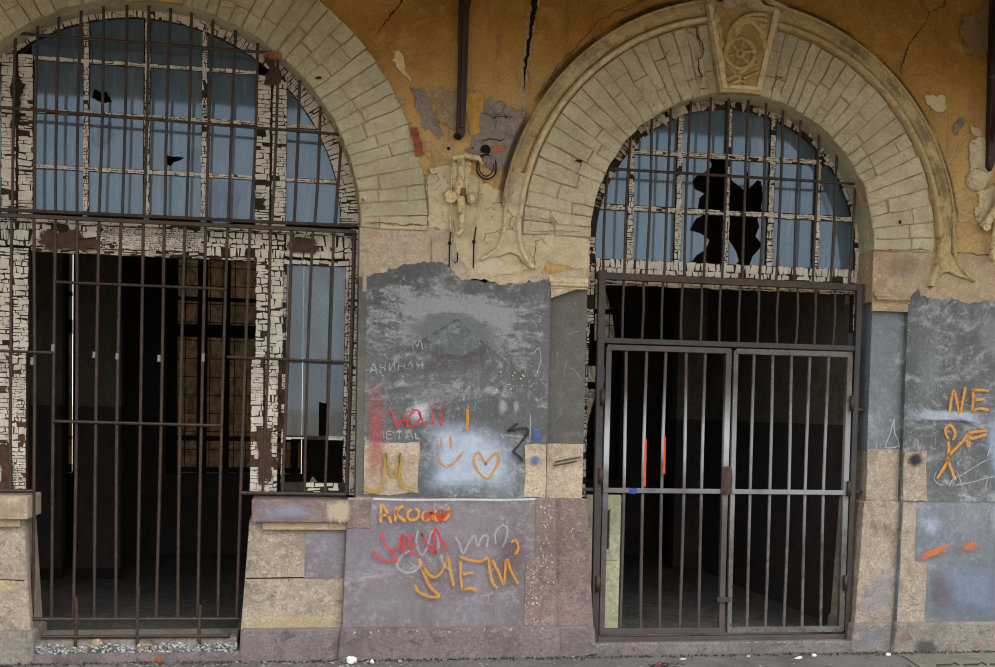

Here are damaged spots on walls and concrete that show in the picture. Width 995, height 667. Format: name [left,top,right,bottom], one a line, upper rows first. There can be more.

peeling [264,54,285,86]
crack [492,0,642,134]
crack [696,30,705,89]
crack [900,0,946,73]
flaking render [960,0,989,63]
peeling [8,73,26,133]
flaking render [392,50,528,172]
peeling [925,94,946,112]
peeling [953,118,982,136]
peeling [974,183,995,227]
peeling [36,229,101,253]
peeling [287,236,319,255]